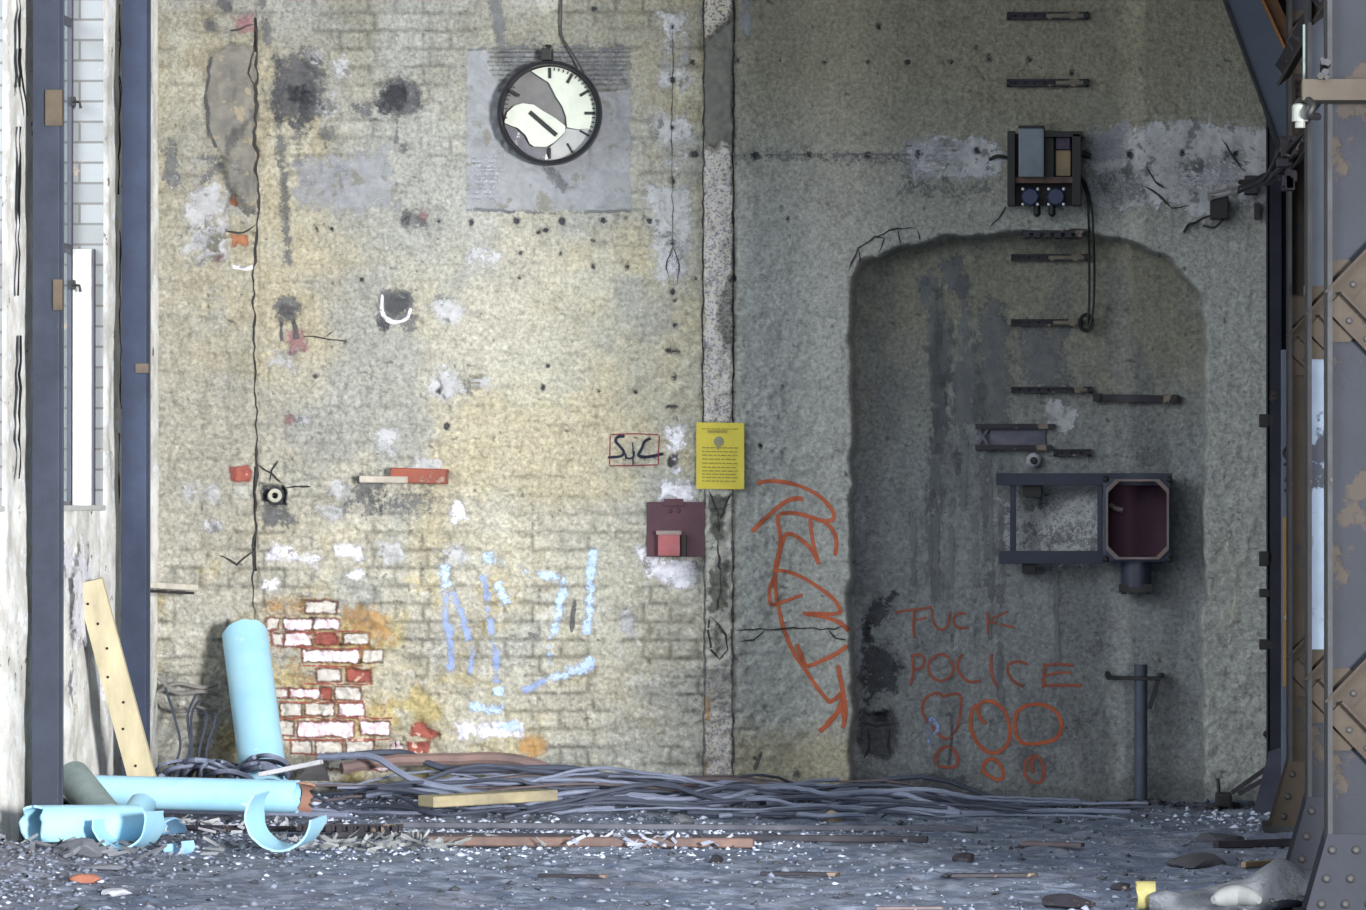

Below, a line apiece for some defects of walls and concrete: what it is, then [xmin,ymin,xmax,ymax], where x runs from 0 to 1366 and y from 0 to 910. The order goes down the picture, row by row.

peeling [905,136,980,180]
peeling [1168,146,1249,199]
peeling [468,247,501,265]
crack [849,227,920,269]
crack [219,9,282,620]
peeling [427,363,497,403]
peeling [373,425,443,469]
peeling [175,461,406,593]
peeling [449,500,469,525]
water stain [857,253,1074,723]
flaking render [265,592,525,772]
flaking render [856,708,899,759]